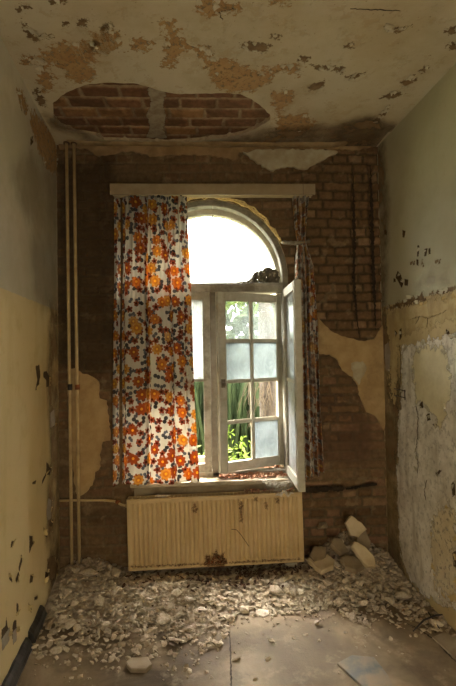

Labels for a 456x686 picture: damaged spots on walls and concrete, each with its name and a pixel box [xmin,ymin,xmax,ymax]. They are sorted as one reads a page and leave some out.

flaking render [15,4,365,177]
leakage [230,118,395,302]
peeling [35,365,51,391]
flaking render [383,285,456,610]
peeling [9,536,35,583]
peeling [30,556,59,584]
peeling [1,603,21,651]